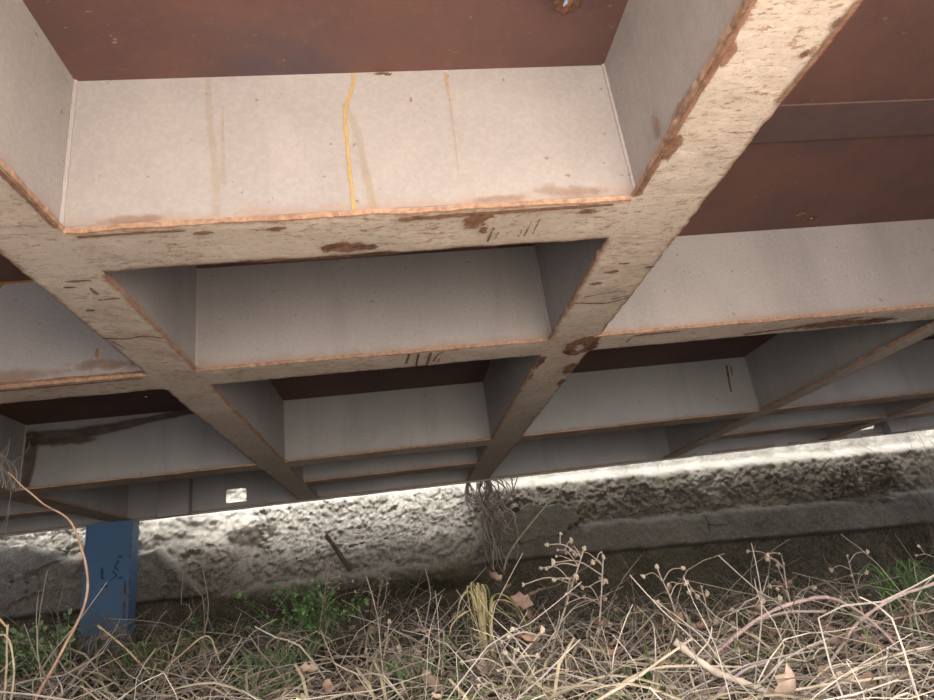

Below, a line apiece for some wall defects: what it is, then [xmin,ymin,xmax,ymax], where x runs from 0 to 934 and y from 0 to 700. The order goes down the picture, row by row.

corrosion [344,74,355,210]